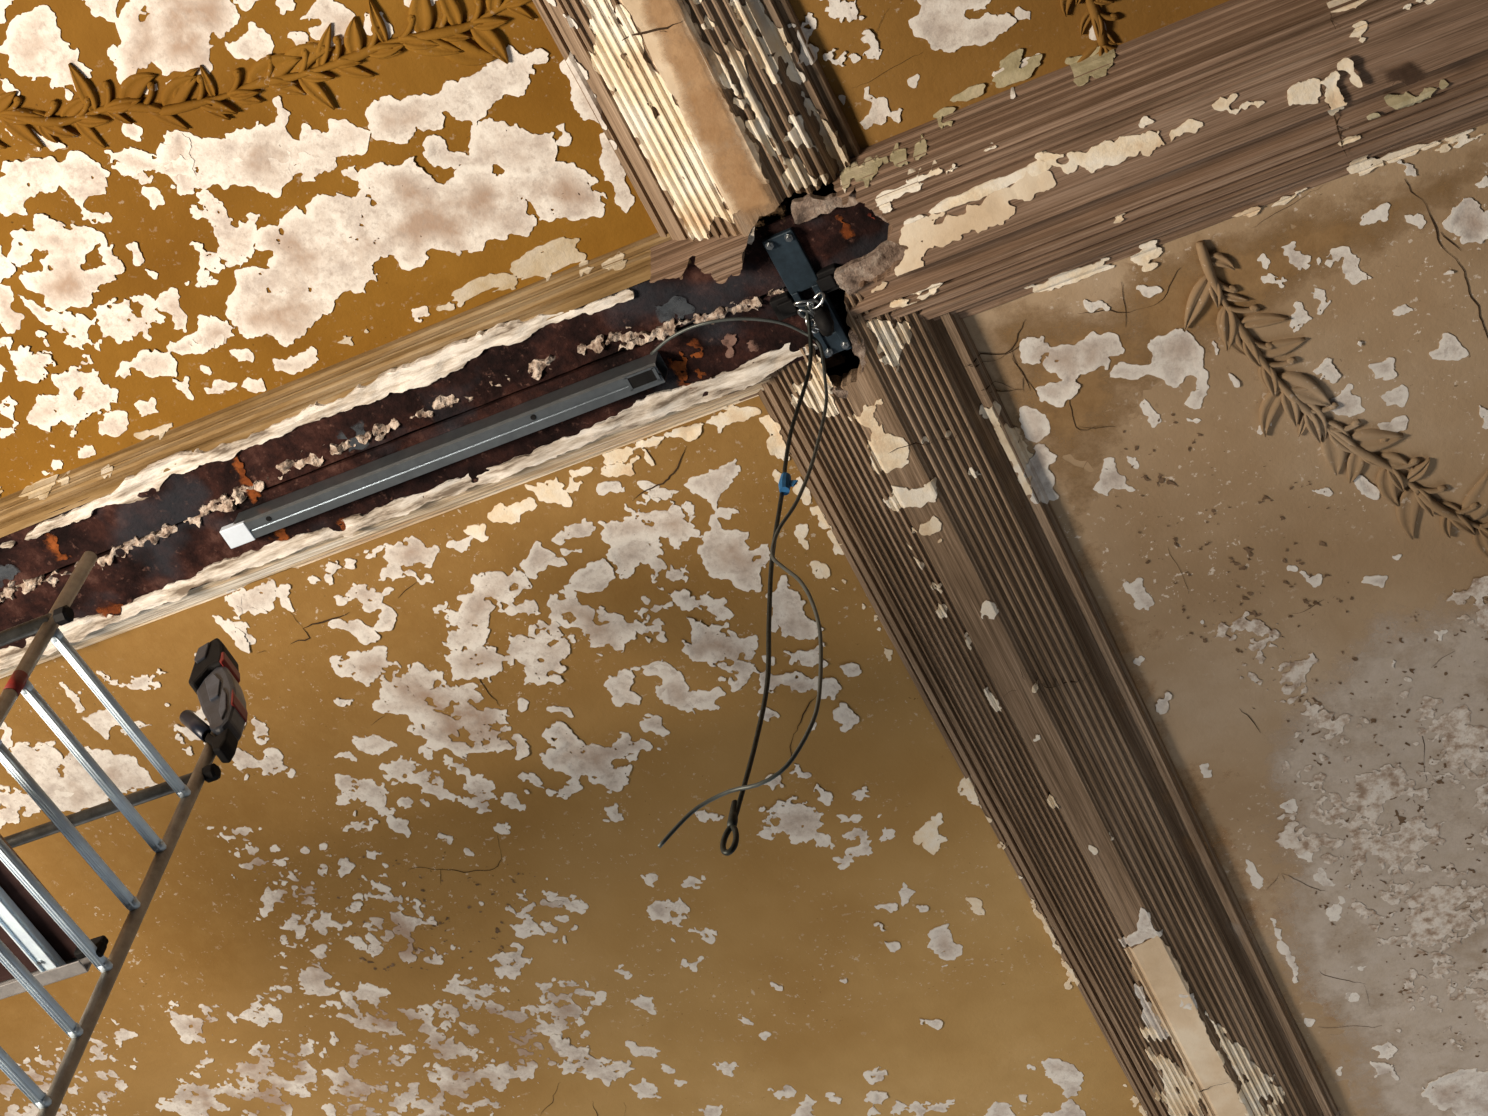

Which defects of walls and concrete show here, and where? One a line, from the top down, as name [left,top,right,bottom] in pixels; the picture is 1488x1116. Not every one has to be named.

leakage [644,0,773,213]
peeling [701,0,958,308]
peeling [908,0,1030,53]
rust [47,533,68,561]
rust [96,604,123,618]
rust [232,457,261,503]
peeling [0,45,635,602]
rust [721,334,758,358]
peeling [979,328,1219,504]
crack [1405,180,1488,338]
leakage [1276,617,1488,1116]
peeling [155,811,687,1116]